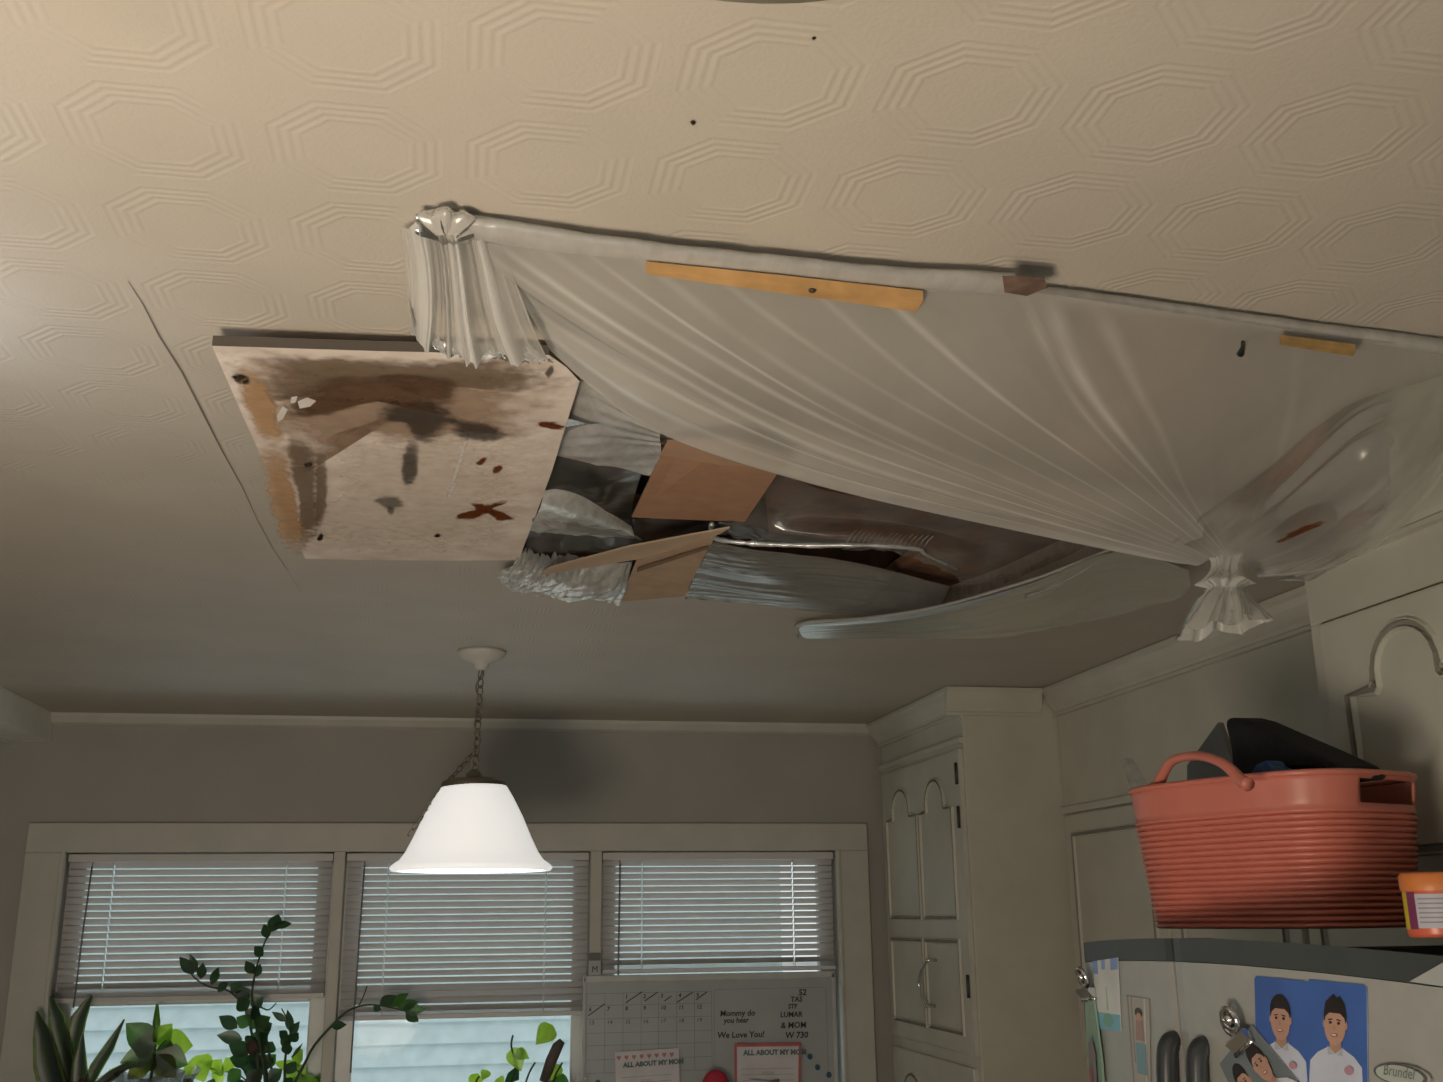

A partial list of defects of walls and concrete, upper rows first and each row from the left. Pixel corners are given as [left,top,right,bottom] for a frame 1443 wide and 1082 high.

damp [242,359,525,544]